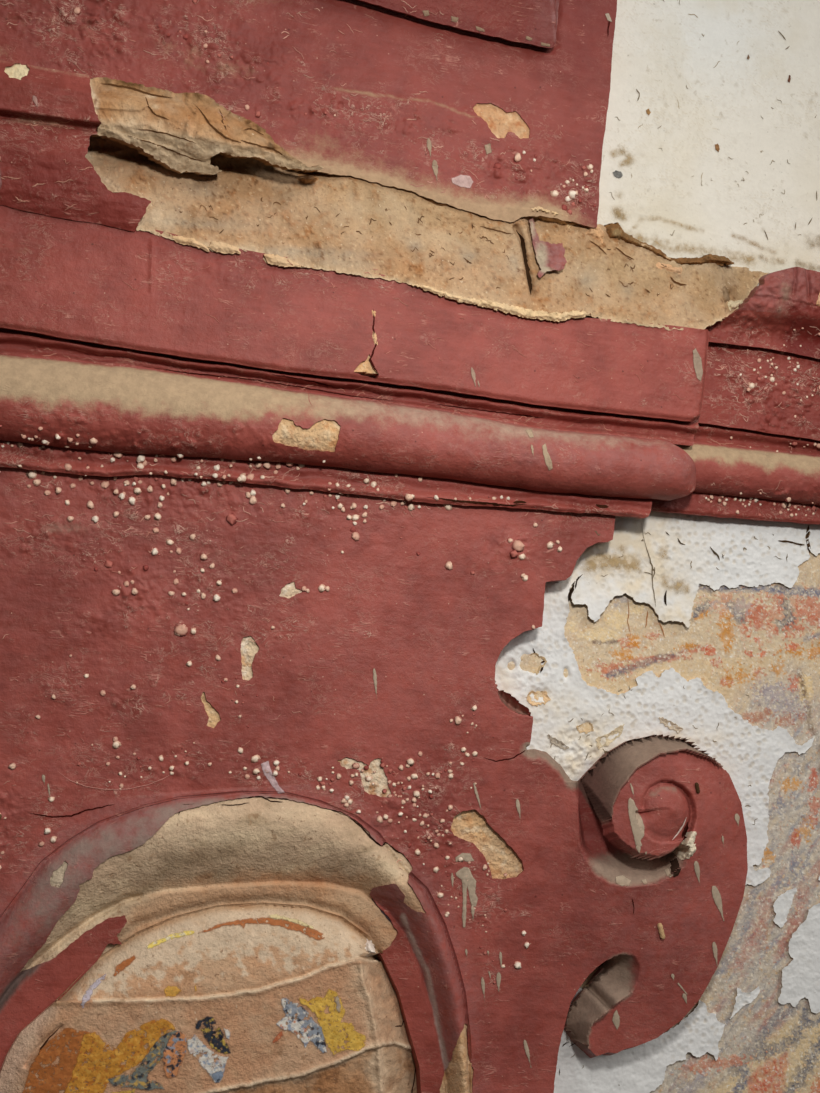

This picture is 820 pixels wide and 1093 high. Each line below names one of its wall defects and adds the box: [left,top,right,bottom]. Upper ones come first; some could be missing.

spalling [71,61,324,175]
peeling [472,103,530,170]
peeling [529,218,567,278]
peeling [272,418,340,452]
crack [627,523,724,638]
peeling [495,507,820,887]
peeling [337,757,415,797]
peeling [20,797,425,972]
peeling [451,806,523,879]
peeling [773,888,820,1015]
peeling [440,1024,473,1093]
peeling [554,986,760,1093]